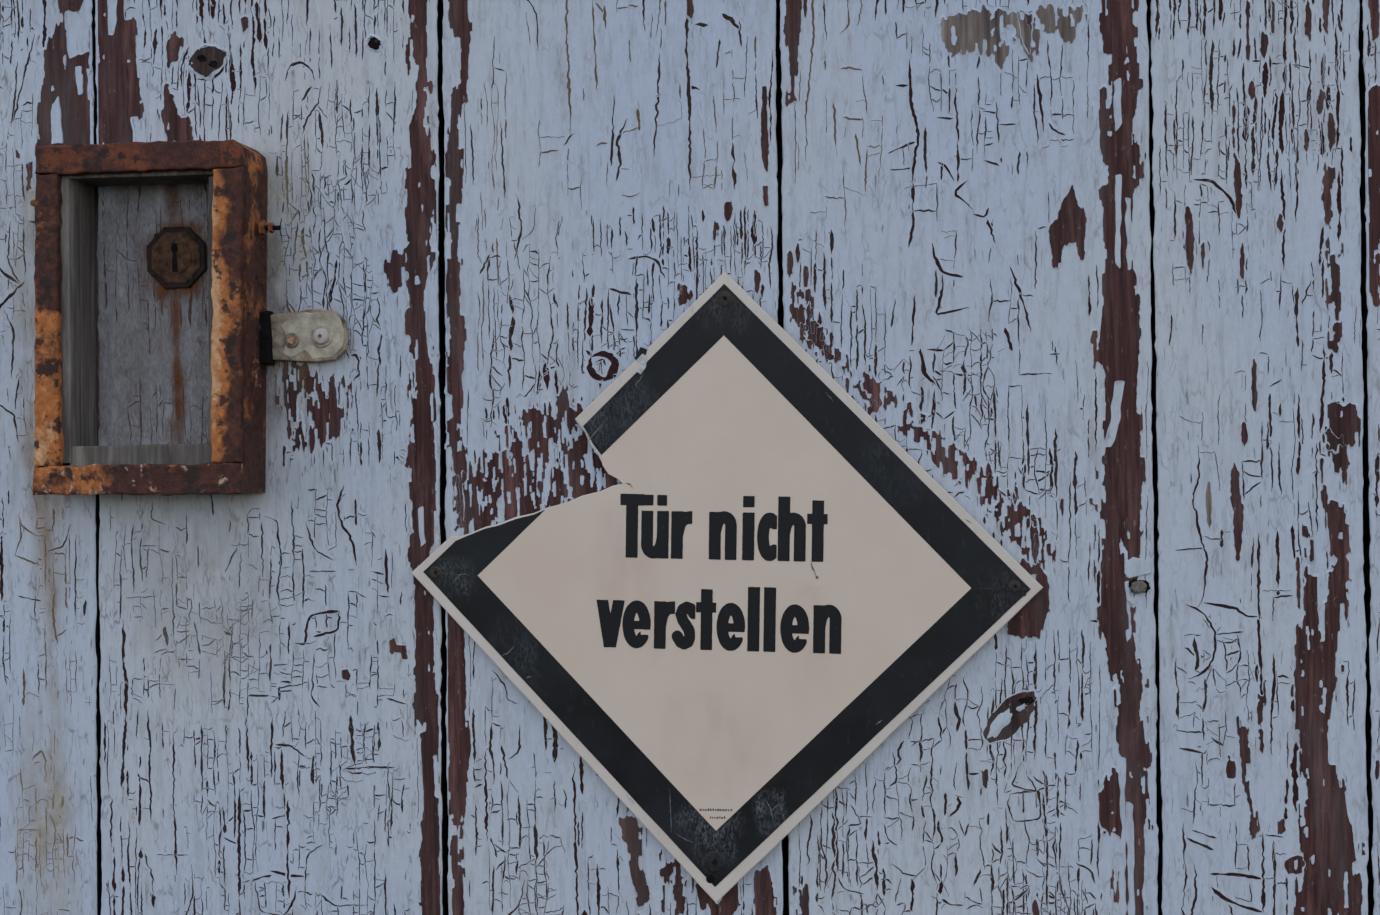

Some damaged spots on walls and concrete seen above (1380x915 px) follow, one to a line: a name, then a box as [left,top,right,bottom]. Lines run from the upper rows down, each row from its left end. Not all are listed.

peeling [15,0,203,194]
rust [172,360,182,431]
crack [0,0,421,915]
peeling [273,360,355,454]
peeling [383,0,622,915]
peeling [618,814,811,915]
crack [462,0,1105,915]
peeling [785,241,1058,641]
peeling [938,0,1155,915]
crack [1142,0,1380,915]
peeling [1225,400,1380,915]
peeling [1301,89,1345,354]